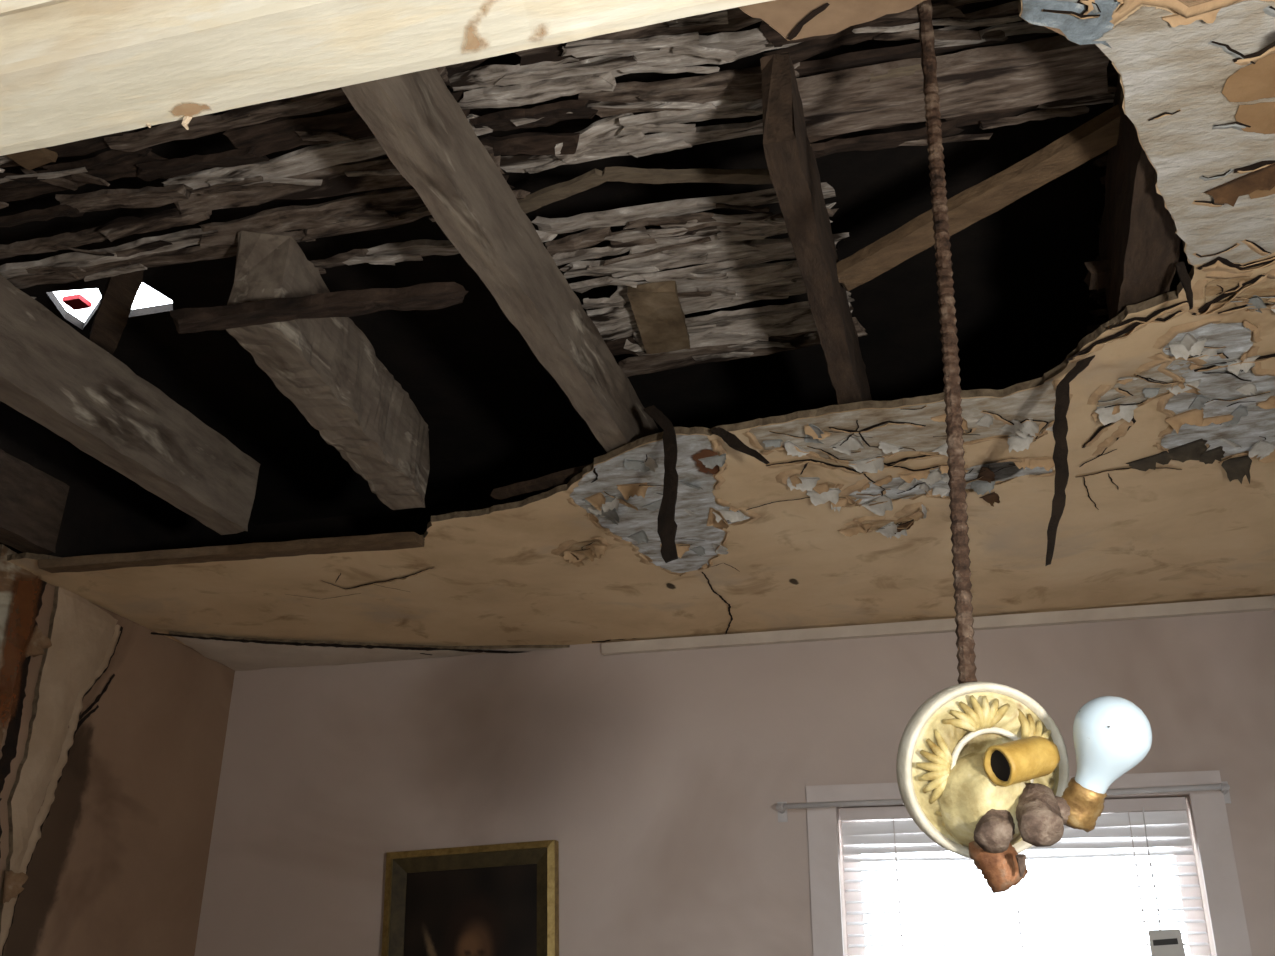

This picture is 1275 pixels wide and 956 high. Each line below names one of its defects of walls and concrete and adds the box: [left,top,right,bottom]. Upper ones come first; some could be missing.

peeling [171,103,210,130]
peeling [1021,0,1275,484]
crack [287,567,437,599]
peeling [551,435,761,589]
peeling [742,378,1073,538]
crack [0,580,523,956]